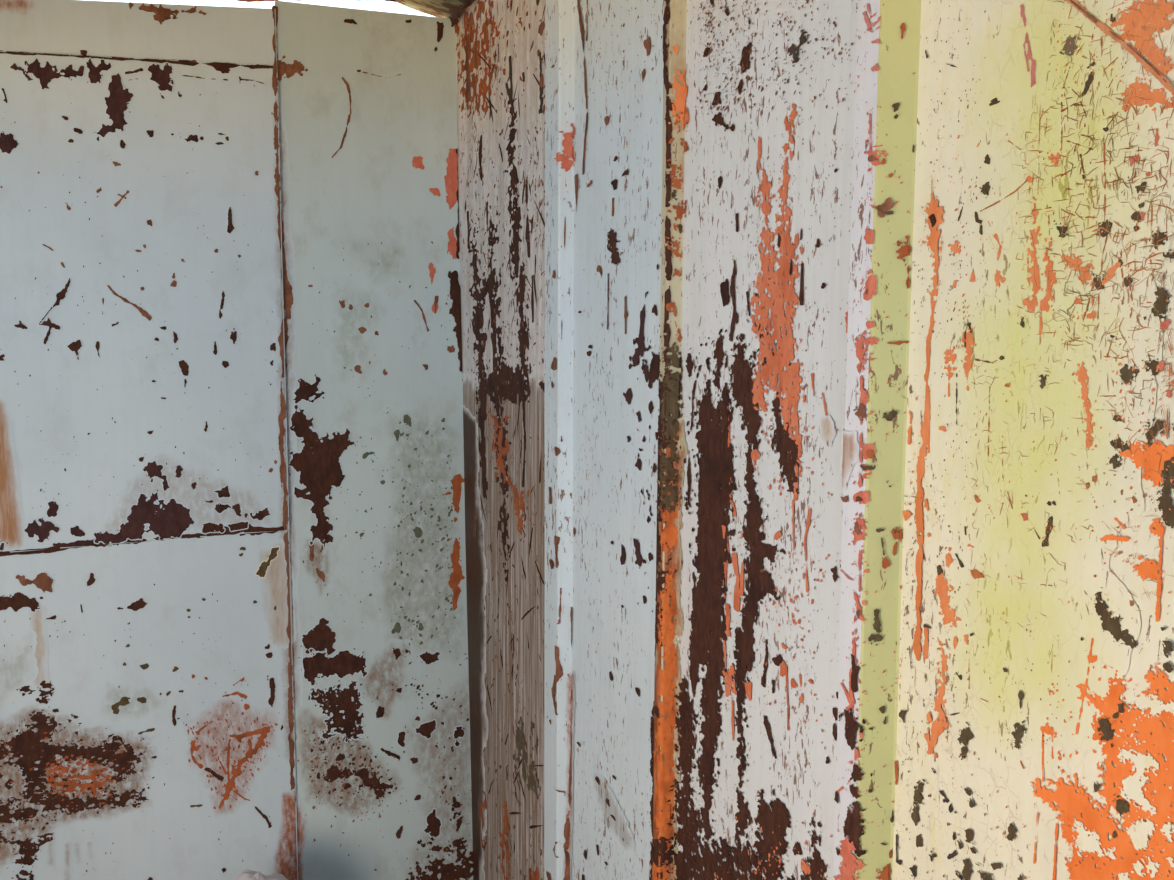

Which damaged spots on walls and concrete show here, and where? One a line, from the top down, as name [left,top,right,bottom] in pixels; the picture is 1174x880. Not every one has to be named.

peeling [0,681,155,880]
peeling [0,2,393,828]
corrosion [93,109,409,880]
corrosion [276,55,308,81]
corrosion [355,0,546,880]
corrosion [561,670,575,880]
corrosion [649,0,687,880]
peeling [702,84,734,132]
peeling [610,103,919,880]
crack [937,0,1174,879]
peeling [1010,358,1174,880]
peeling [1131,172,1174,262]